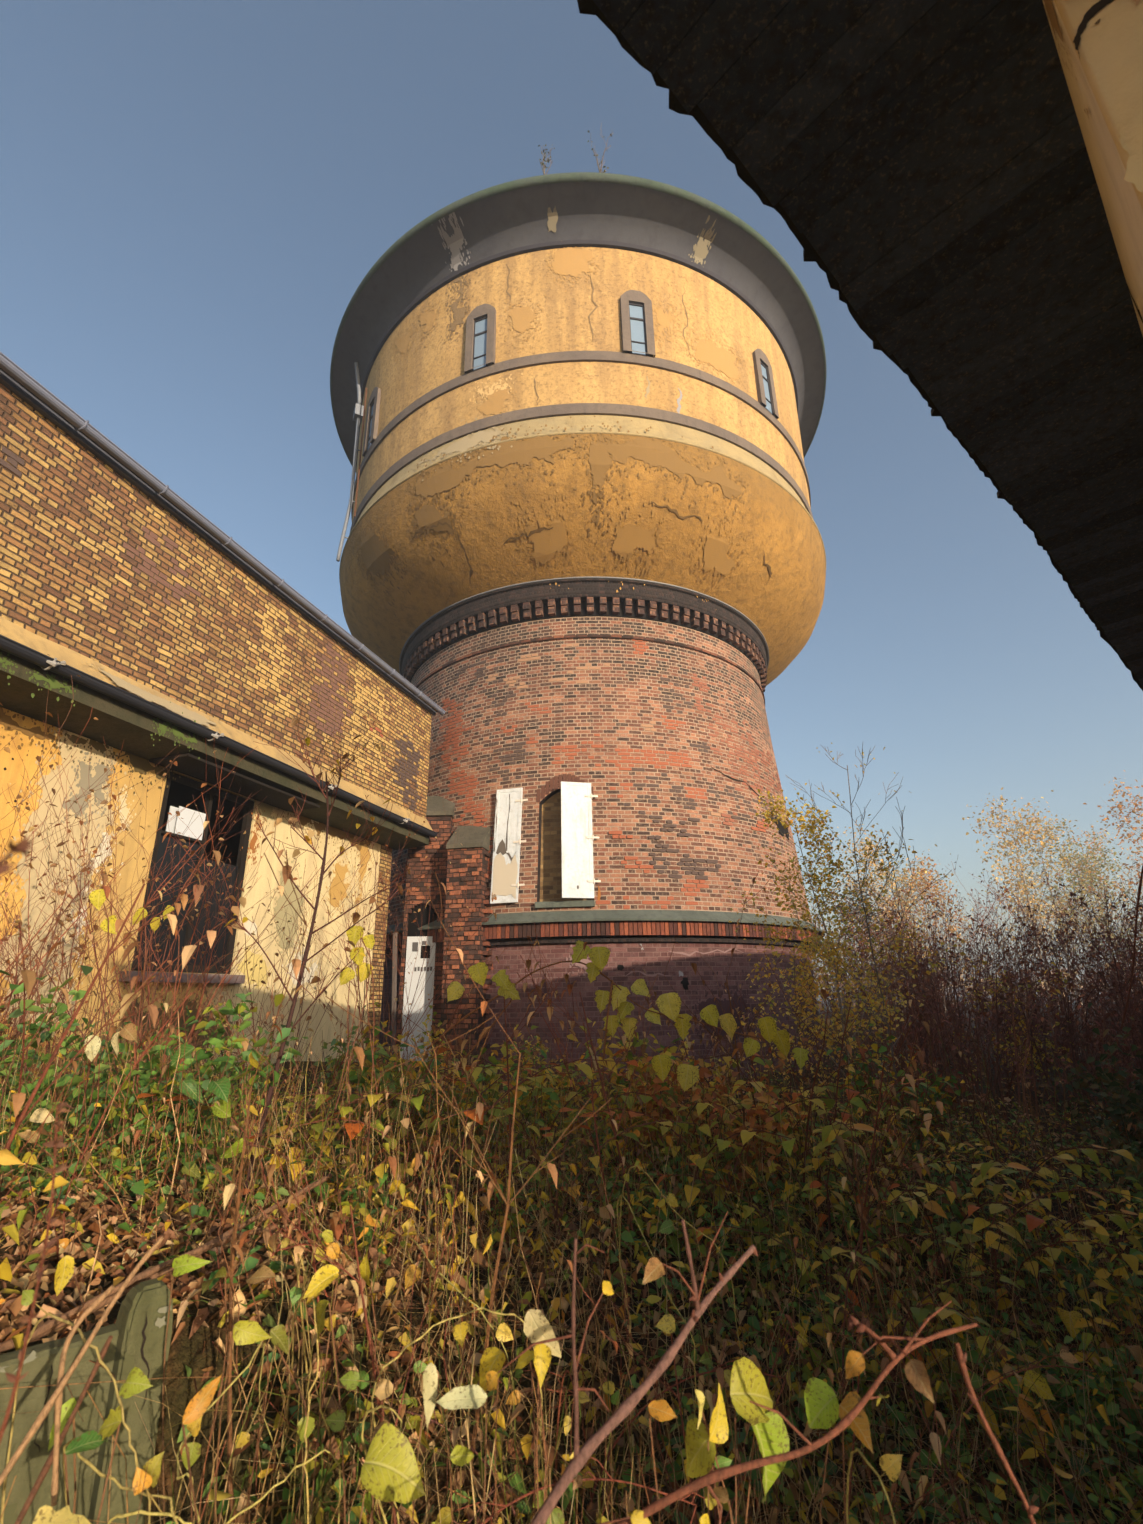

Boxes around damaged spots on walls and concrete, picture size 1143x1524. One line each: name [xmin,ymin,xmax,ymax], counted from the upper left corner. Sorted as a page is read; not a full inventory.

crack [1073,0,1113,61]
flaking render [0,726,136,1037]